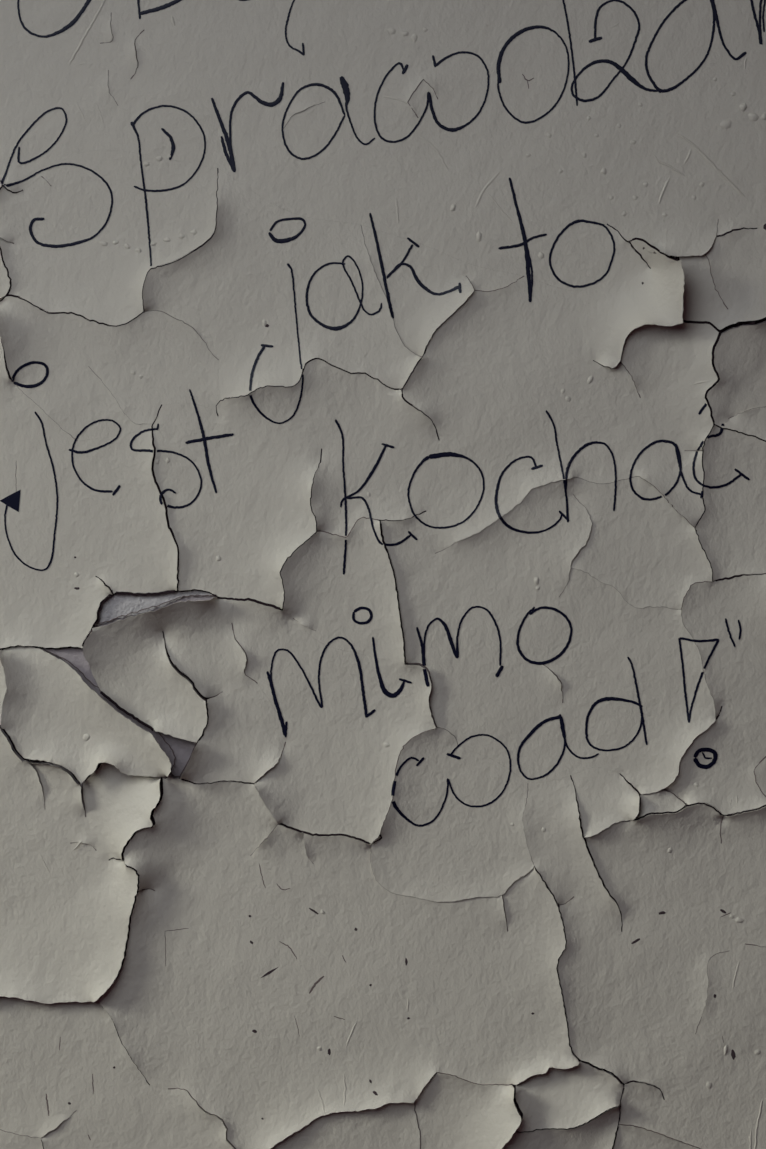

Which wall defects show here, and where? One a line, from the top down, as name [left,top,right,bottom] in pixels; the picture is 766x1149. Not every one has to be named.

crack [1,338,78,441]
crack [0,366,701,1149]
crack [216,226,524,440]
peeling [0,150,766,581]
peeling [0,252,766,1149]
crack [559,219,766,932]
crack [695,944,761,1034]